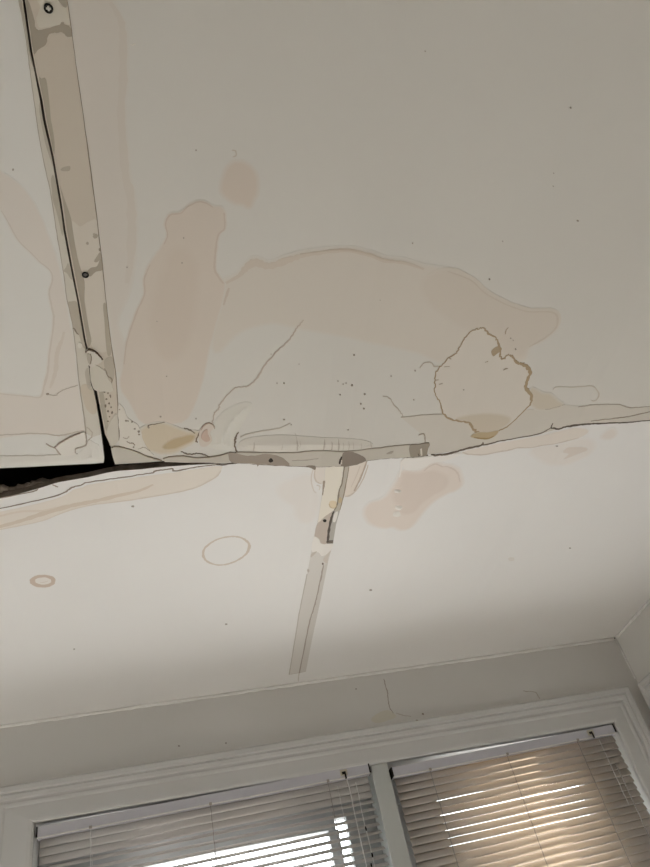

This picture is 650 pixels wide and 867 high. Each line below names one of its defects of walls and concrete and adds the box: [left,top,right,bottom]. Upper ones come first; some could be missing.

peeling [20,0,72,66]
peeling [39,77,55,153]
leakage [68,0,619,467]
peeling [60,187,154,457]
peeling [54,431,87,455]
crack [0,320,307,509]
crack [368,411,650,461]
leakage [0,466,222,530]
leakage [362,460,465,531]
leakage [30,575,55,588]
leakage [202,536,251,566]
peeling [311,511,333,563]